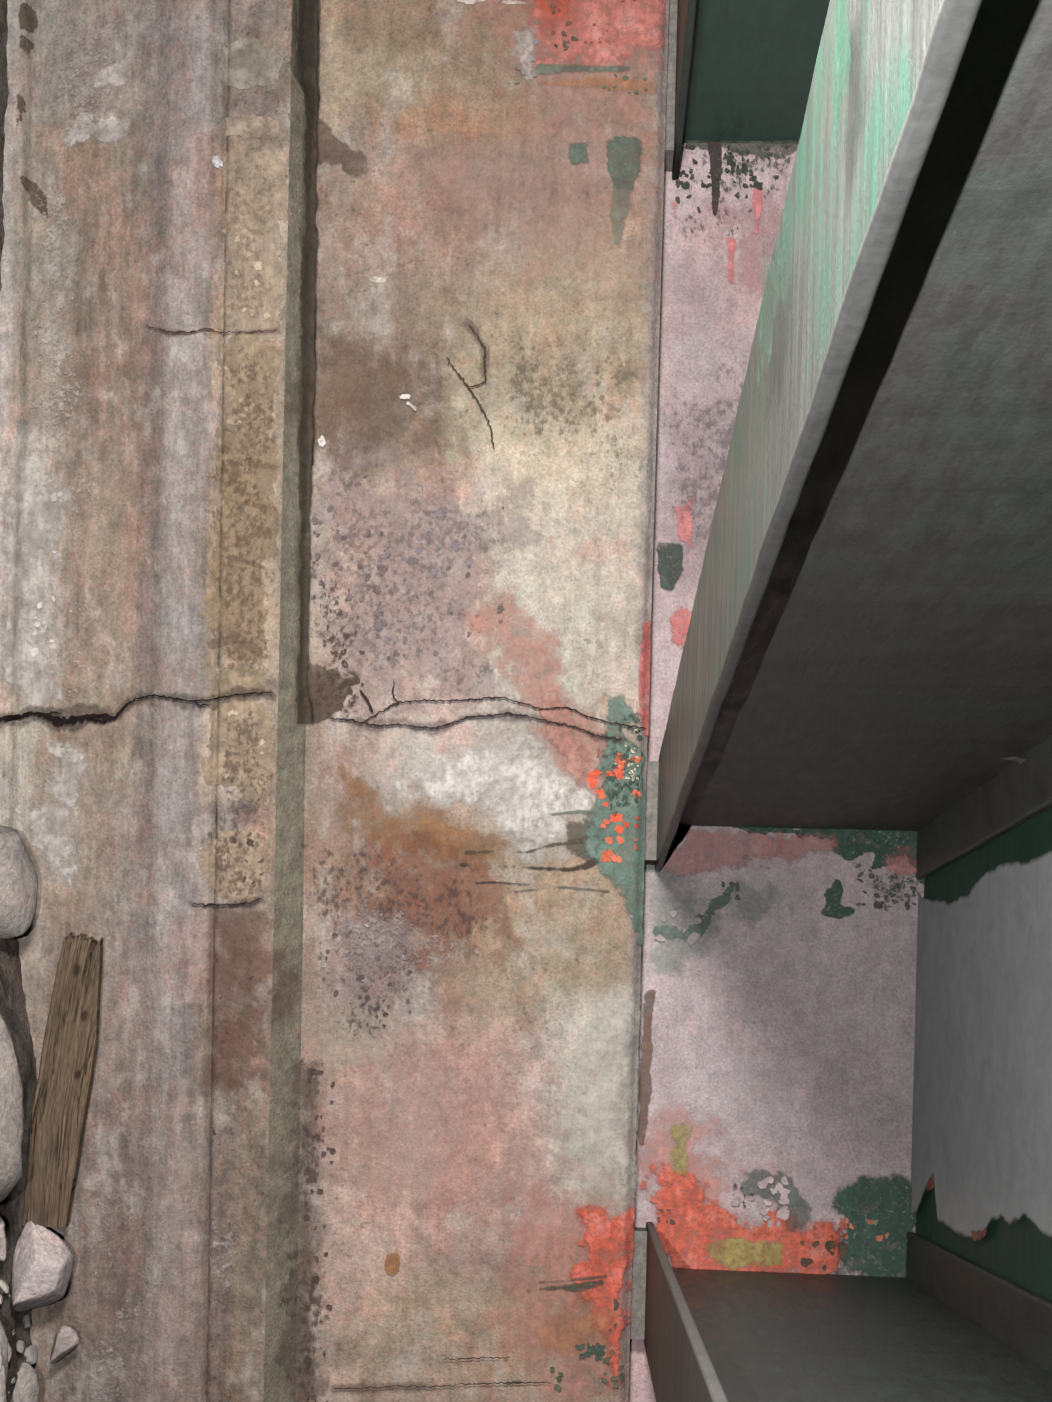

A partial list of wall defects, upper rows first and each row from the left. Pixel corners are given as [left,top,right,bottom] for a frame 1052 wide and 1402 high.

crack [446,324,495,450]
peeling [669,609,692,646]
crack [0,691,273,726]
crack [331,680,646,740]
peeling [540,621,925,945]
peeling [640,1162,935,1278]
peeling [539,1205,635,1388]